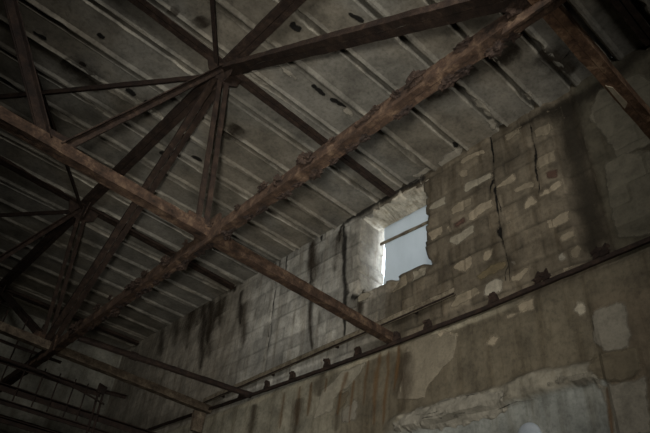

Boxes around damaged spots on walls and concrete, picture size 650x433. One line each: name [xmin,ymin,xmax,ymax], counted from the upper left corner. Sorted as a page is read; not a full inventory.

crack [530,125,540,190]
water stain [308,235,323,286]
water stain [336,176,425,314]
crack [490,179,510,281]
water stain [187,297,225,368]
peeling [397,331,457,399]
spalling [392,389,508,432]
peeling [548,373,650,433]